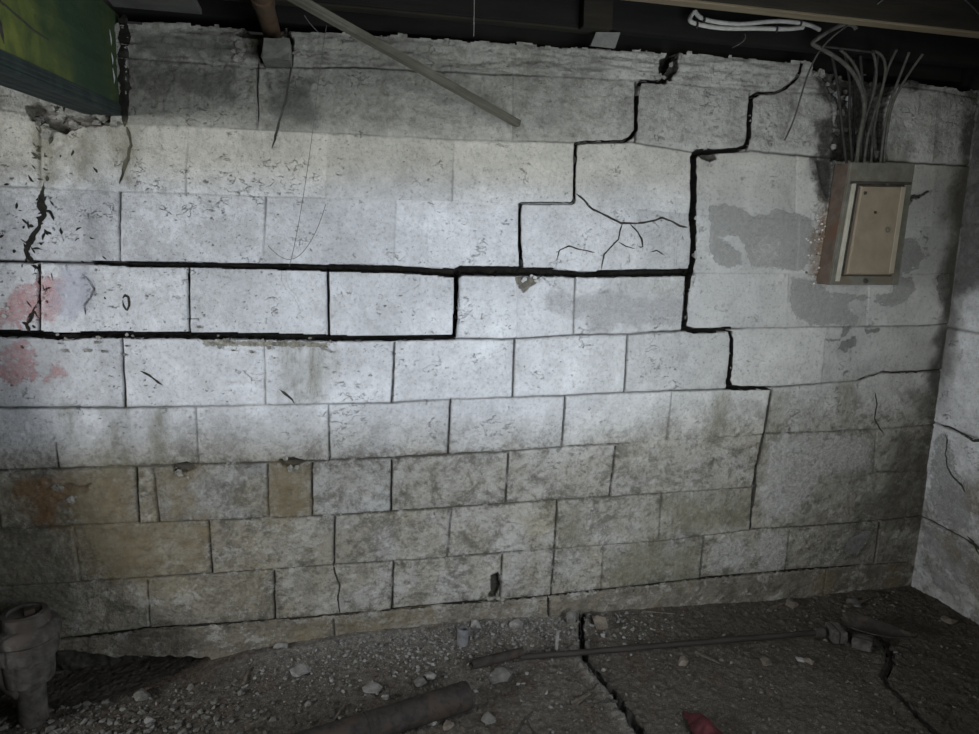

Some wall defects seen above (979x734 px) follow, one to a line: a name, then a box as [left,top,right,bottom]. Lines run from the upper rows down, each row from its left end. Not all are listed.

crack [0,0,50,42]
spalling [25,102,118,139]
crack [0,14,815,529]
crack [941,424,979,493]
crack [923,517,979,554]
crack [69,564,851,734]
crack [874,635,942,734]